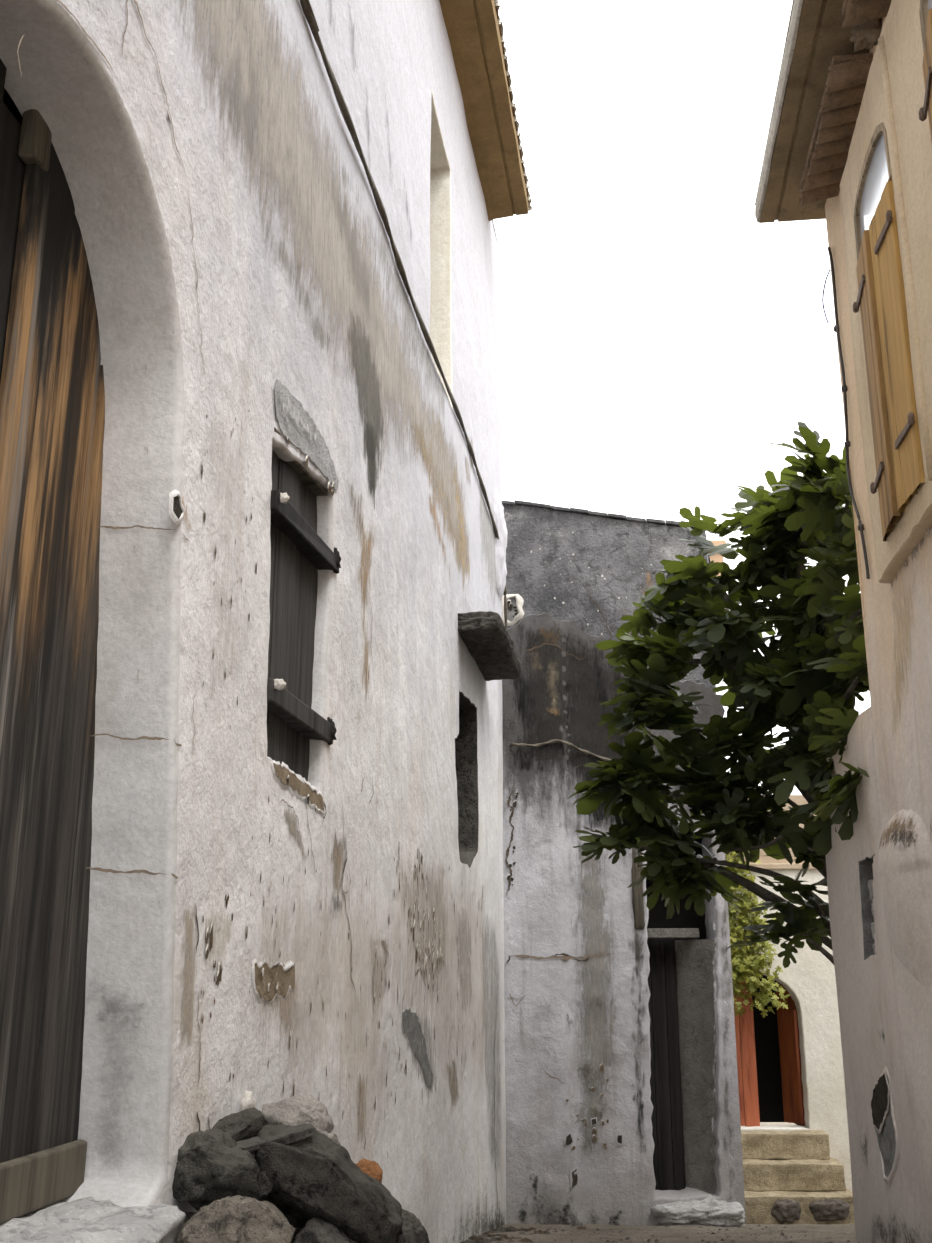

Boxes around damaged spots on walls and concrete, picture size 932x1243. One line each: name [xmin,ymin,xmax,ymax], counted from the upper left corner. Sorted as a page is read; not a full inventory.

crack [56,0,205,374]
damp [181,0,473,563]
damp [352,495,372,628]
spalling [271,760,326,874]
crack [505,787,519,899]
peeling [201,915,222,1023]
spalling [249,871,298,1049]
peeling [349,848,444,1150]
peeling [447,1001,485,1102]
crack [494,953,614,1059]
spalling [870,1066,899,1187]